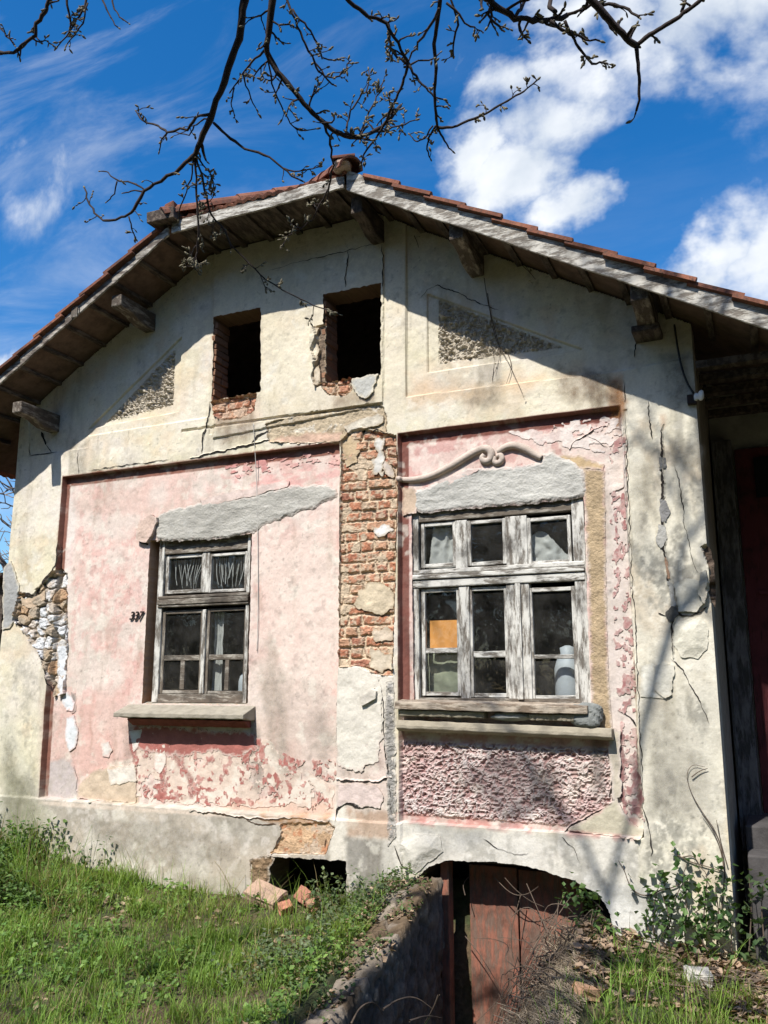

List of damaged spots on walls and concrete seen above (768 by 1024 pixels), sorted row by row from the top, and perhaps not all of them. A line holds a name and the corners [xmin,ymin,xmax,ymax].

spalling [2,561,79,751]
crack [29,403,270,473]
spalling [76,325,417,885]
crack [422,285,498,310]
spalling [509,416,645,840]
crack [569,385,709,855]